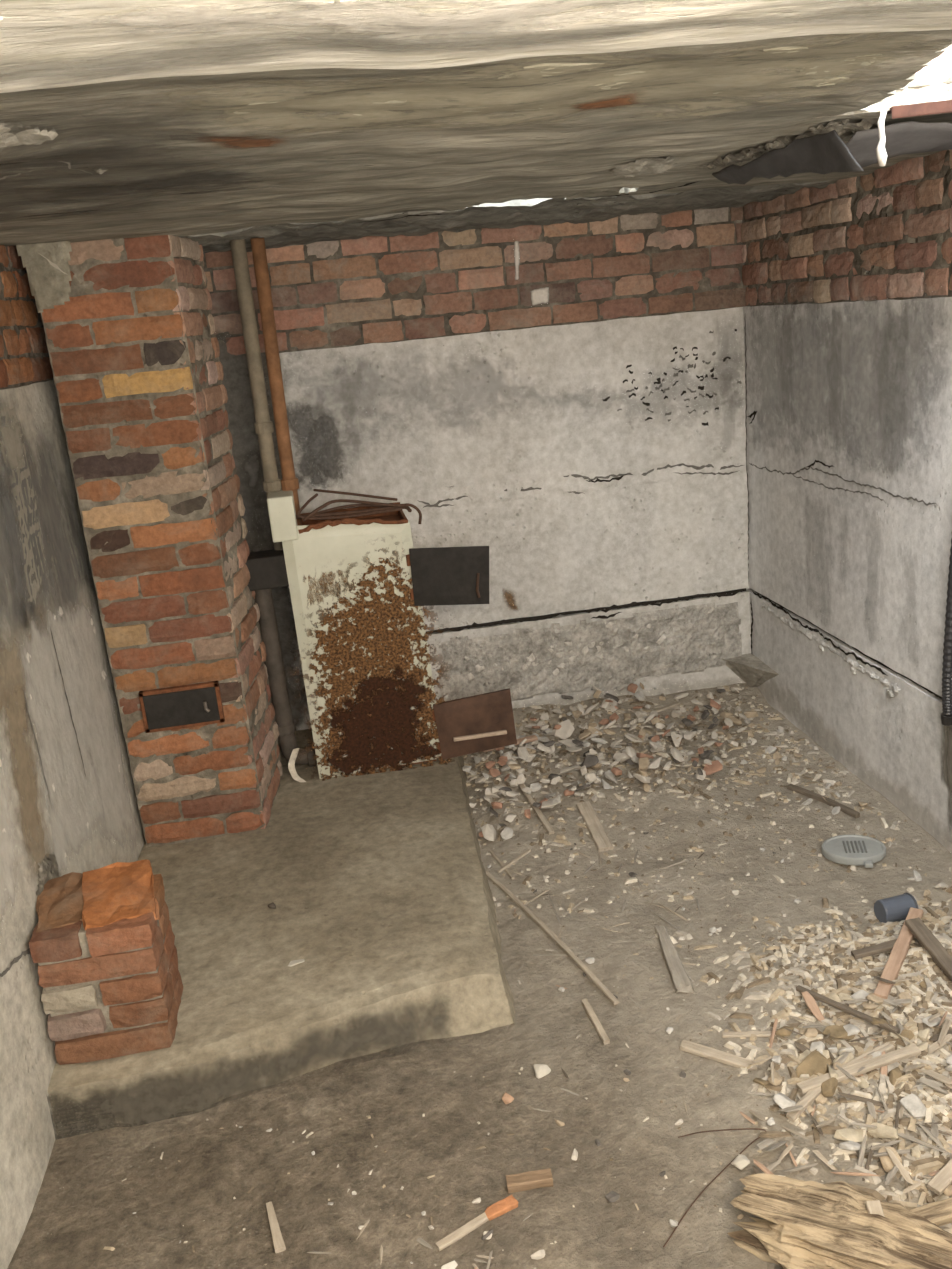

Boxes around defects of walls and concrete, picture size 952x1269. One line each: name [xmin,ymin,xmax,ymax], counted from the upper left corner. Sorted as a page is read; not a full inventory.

spalling [696,118,879,170]
crack [417,486,468,508]
crack [426,321,942,699]
leakage [0,406,94,871]
crack [0,948,31,977]